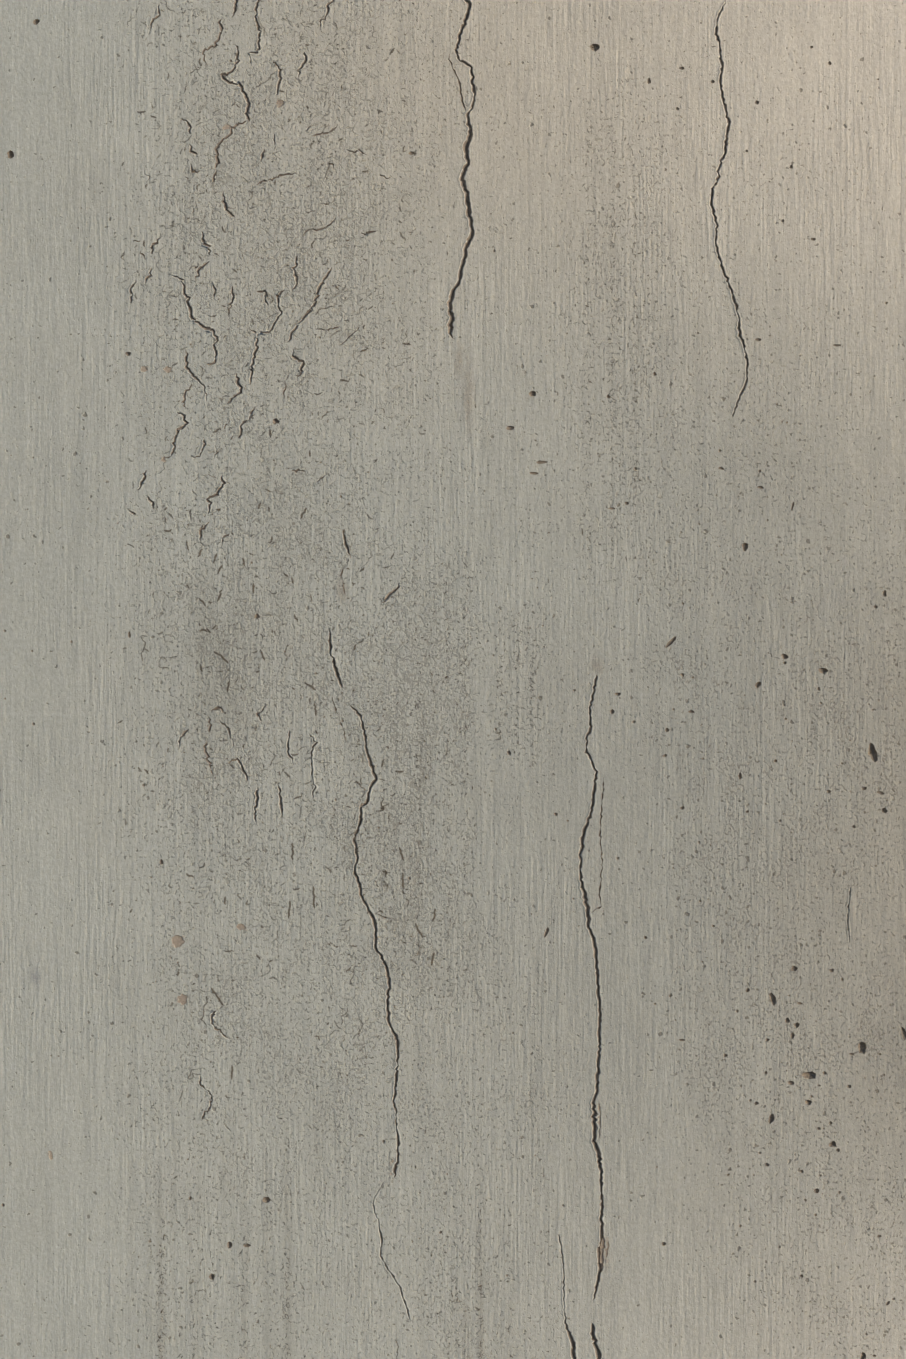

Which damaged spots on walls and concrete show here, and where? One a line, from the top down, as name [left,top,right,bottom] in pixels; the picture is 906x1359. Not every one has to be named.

crack [63,0,784,1359]